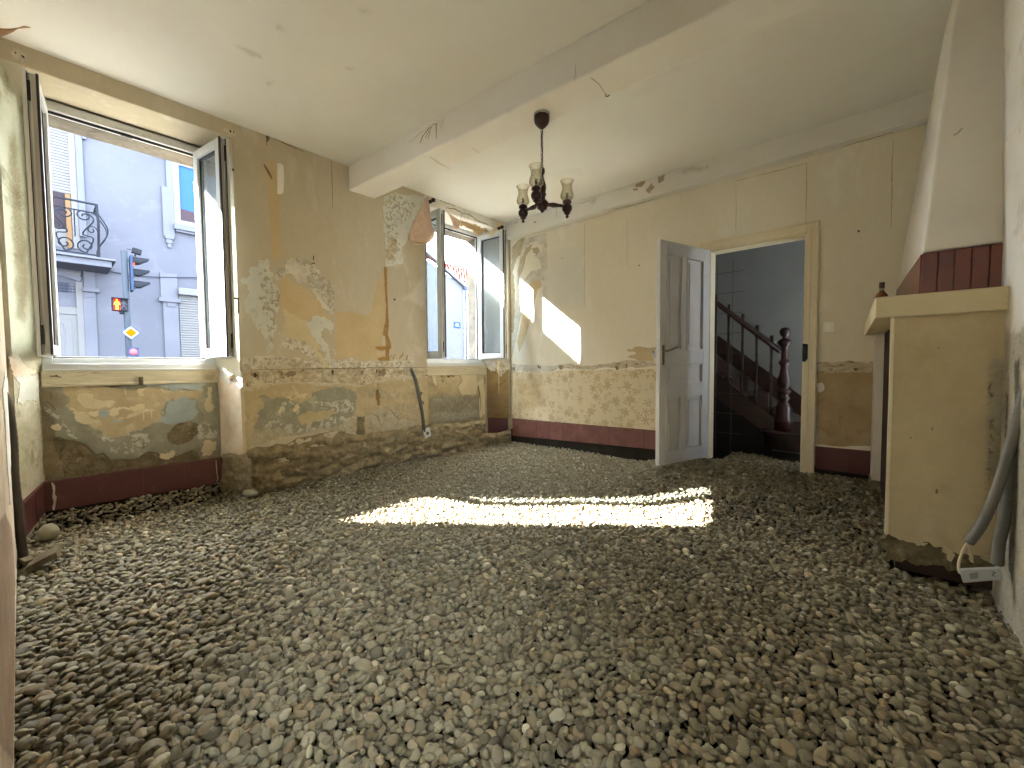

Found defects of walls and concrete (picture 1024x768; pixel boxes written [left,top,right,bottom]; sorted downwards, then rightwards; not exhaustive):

peeling [633,165,709,193]
peeling [485,221,548,376]
flaking render [2,158,425,505]
peeling [615,346,656,370]
spalling [879,534,996,571]